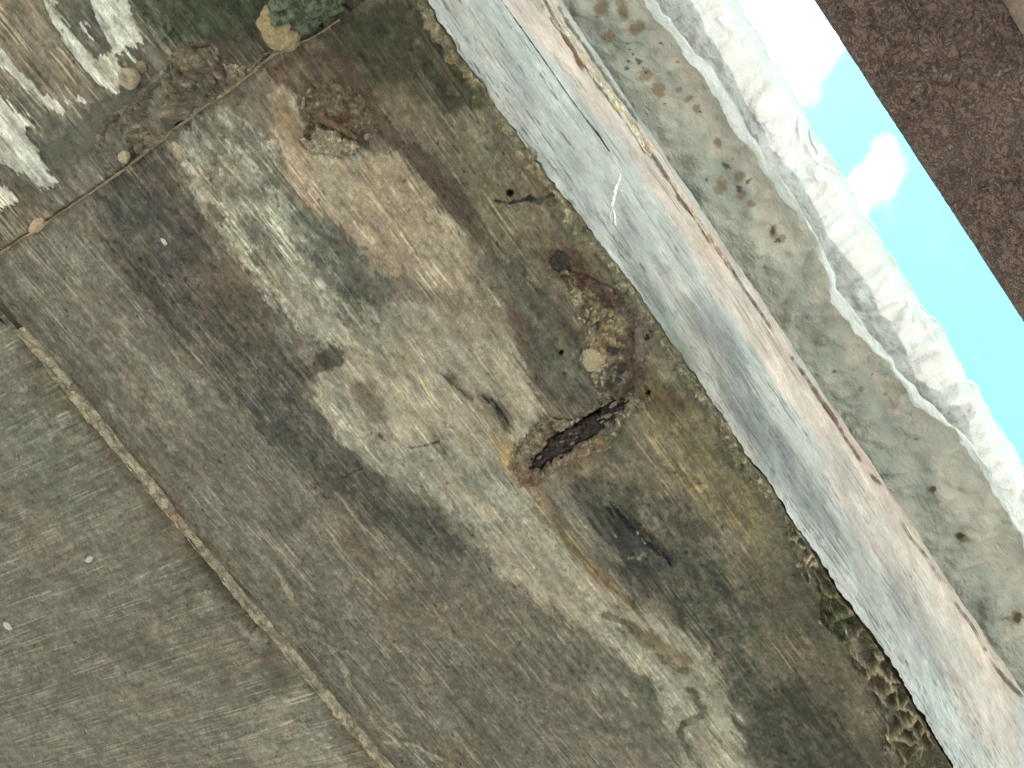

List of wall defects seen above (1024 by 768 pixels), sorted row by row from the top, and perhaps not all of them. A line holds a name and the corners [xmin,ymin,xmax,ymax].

leakage [42,410,104,463]
spalling [295,80,379,158]
leakage [86,24,864,768]
spalling [417,0,794,531]